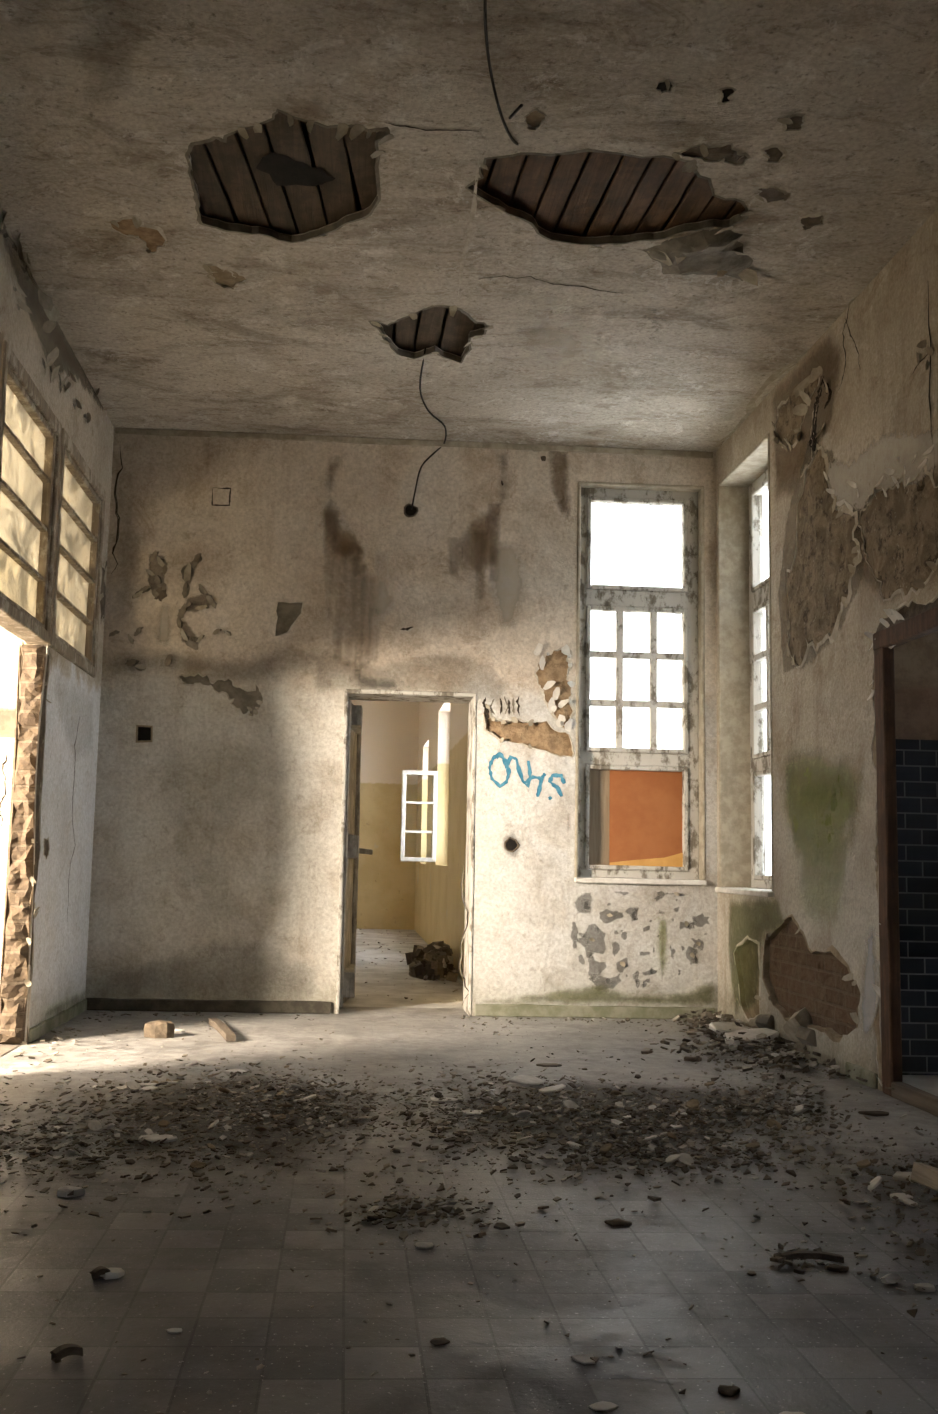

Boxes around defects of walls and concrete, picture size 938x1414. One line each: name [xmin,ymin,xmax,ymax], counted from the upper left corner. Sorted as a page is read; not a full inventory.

flaking render [185,109,394,243]
flaking render [465,113,806,248]
peeling [0,203,103,423]
flaking render [368,305,494,363]
peeling [132,550,263,716]
flaking render [275,601,303,636]
damp [463,523,517,618]
peeling [786,444,938,771]
peeling [483,643,576,758]
peeling [571,892,659,989]
peeling [655,891,709,975]
flaking render [733,914,882,1086]